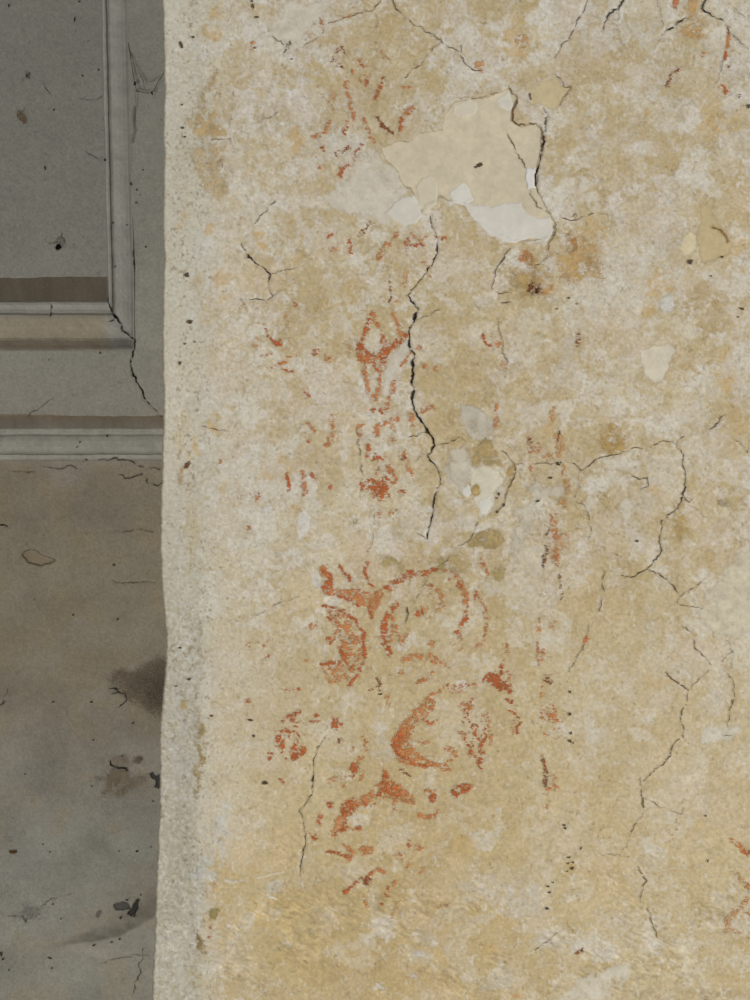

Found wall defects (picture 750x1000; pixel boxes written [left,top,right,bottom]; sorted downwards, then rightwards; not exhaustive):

crack [273,0,480,78]
crack [653,0,745,52]
flaking render [381,88,555,243]
crack [109,304,162,417]
crack [408,215,465,540]
peeling [442,405,505,520]
crack [405,436,735,937]